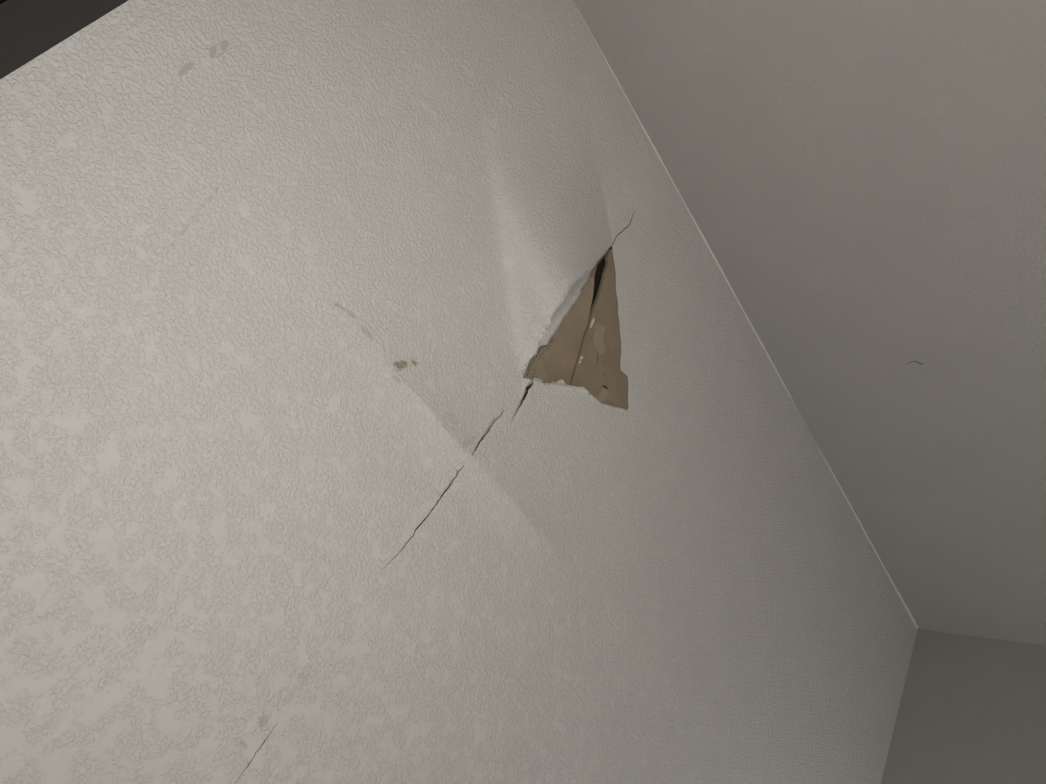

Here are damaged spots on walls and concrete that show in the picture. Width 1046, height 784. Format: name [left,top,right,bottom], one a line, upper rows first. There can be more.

crack [388,383,534,564]